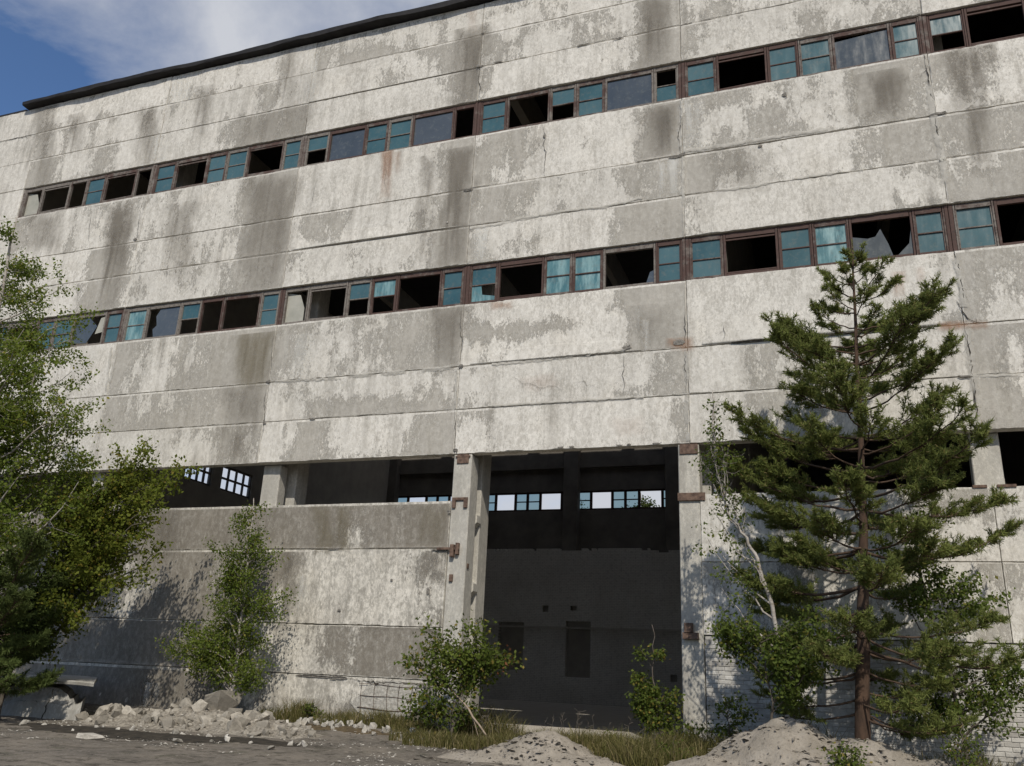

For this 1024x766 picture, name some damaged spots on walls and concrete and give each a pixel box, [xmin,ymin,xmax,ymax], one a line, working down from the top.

crack [921,55,940,136]
water stain [449,151,470,214]
water stain [110,209,131,261]
crack [954,253,983,413]
peeling [12,503,450,724]